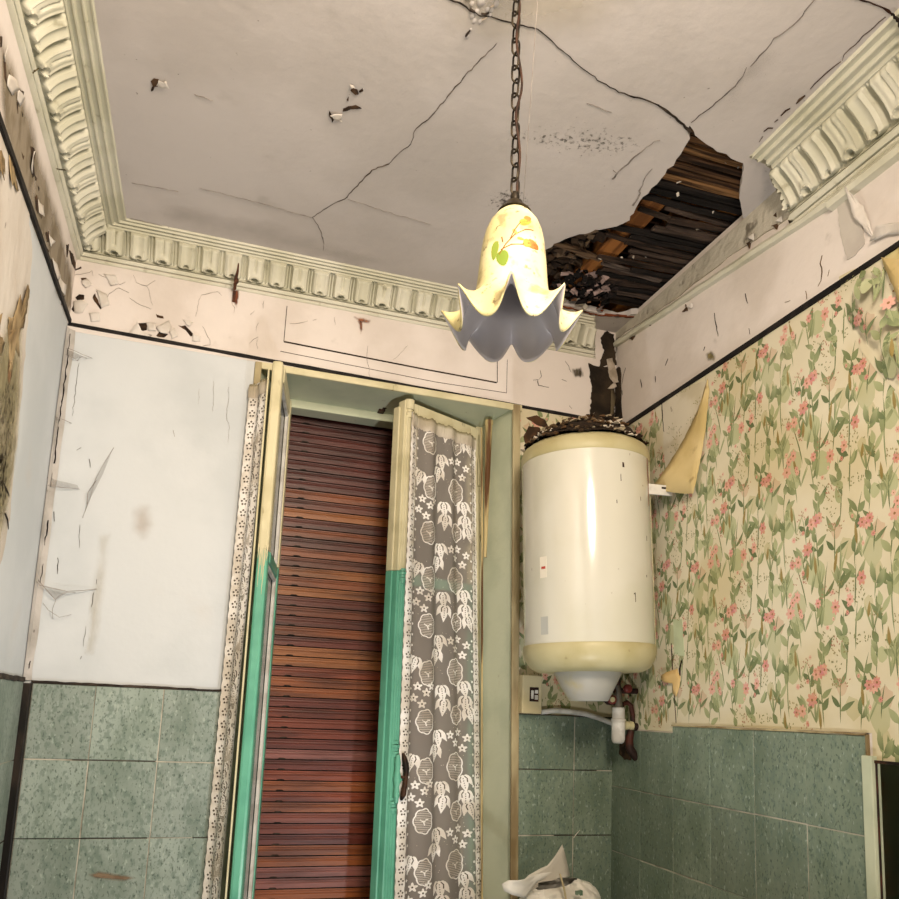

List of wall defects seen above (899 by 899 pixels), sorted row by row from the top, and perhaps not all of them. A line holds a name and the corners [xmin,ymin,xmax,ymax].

peeling [0,36,25,117]
peeling [22,147,45,217]
peeling [329,84,363,122]
crack [200,43,497,249]
peeling [546,228,608,284]
crack [450,0,814,133]
crack [759,0,899,142]
peeling [837,187,899,260]
peeling [129,314,201,342]
leakage [0,333,20,534]
crack [50,333,71,487]
flaking render [588,331,623,422]